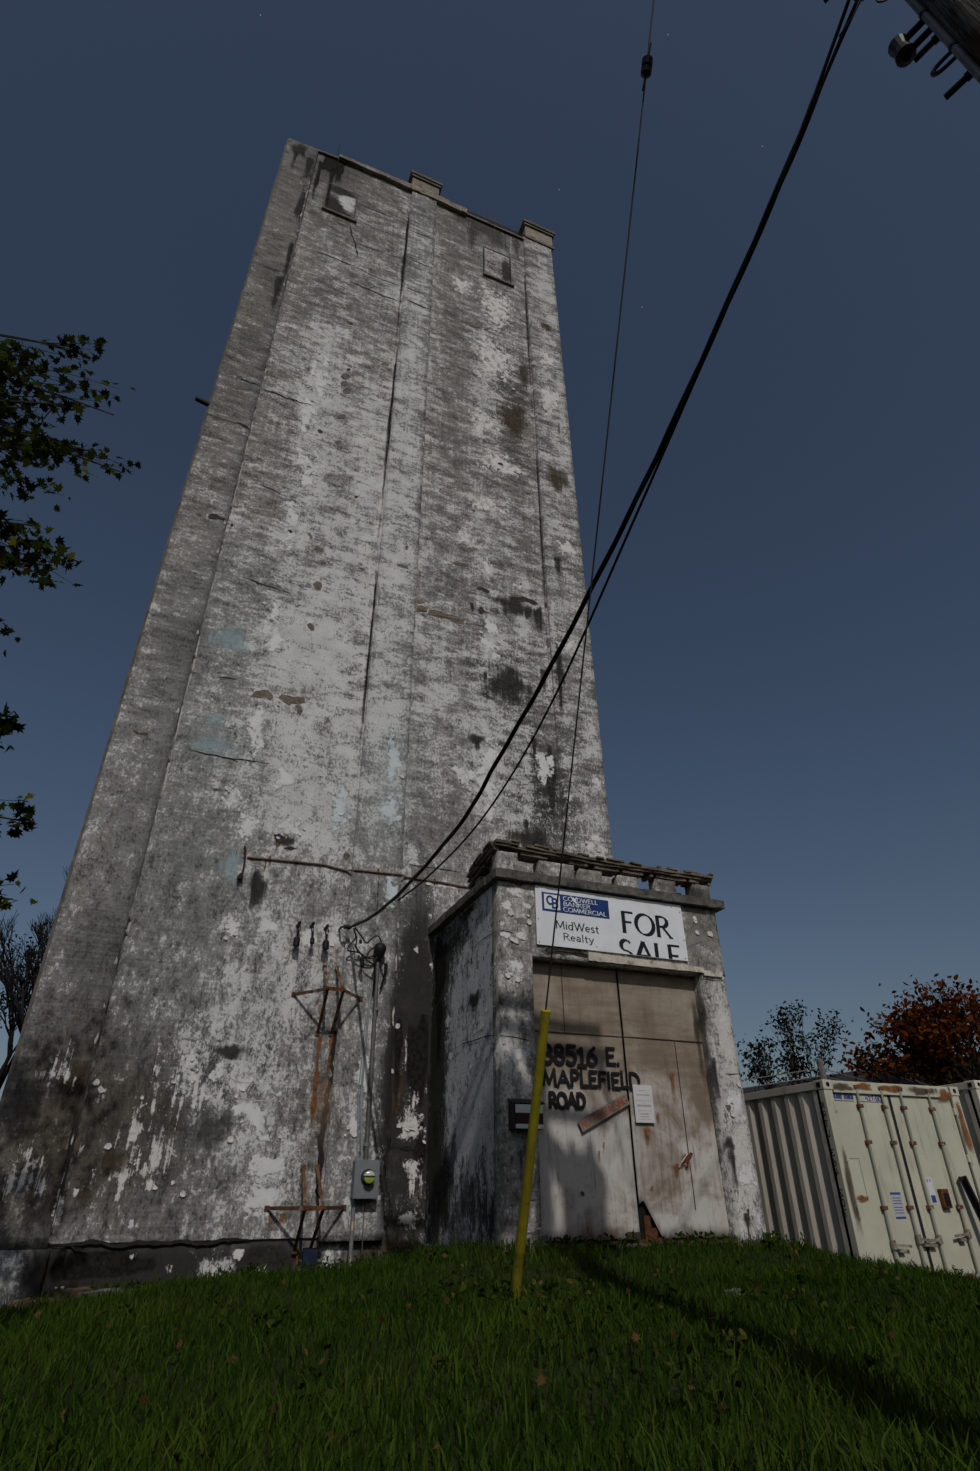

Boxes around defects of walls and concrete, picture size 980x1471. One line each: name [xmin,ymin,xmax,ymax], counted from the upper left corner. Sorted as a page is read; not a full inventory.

water stain [291,144,345,219]
water stain [272,243,294,308]
water stain [484,457,568,708]
crack [61,191,458,1198]
water stain [469,989,479,1008]
rust [311,1036,333,1121]
peeling [354,1056,369,1092]
peeling [391,1023,427,1144]
water stain [387,936,454,1225]
peeling [2,1039,304,1242]
peeling [337,1115,359,1164]
peeling [397,1159,426,1230]